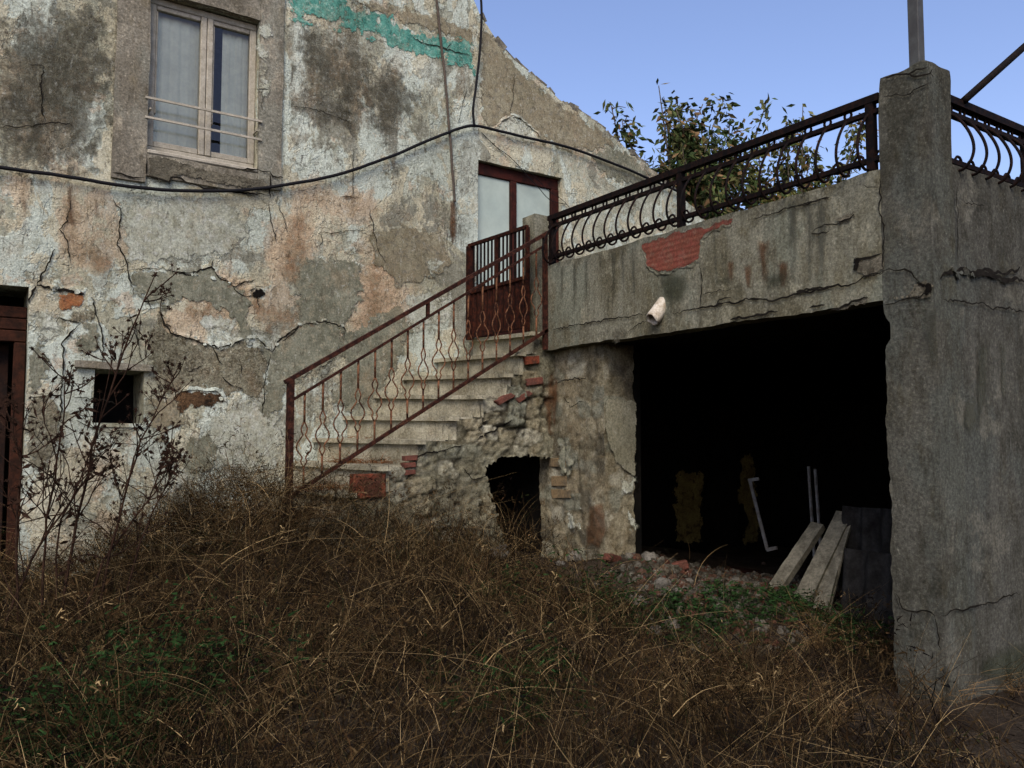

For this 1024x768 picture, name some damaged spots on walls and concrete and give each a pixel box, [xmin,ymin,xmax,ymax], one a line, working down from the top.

crack [1,64,71,128]
peeling [289,0,651,183]
crack [884,67,933,97]
crack [113,159,288,239]
crack [320,154,385,261]
flaking render [642,216,735,277]
crack [673,179,1024,320]
crack [28,201,132,433]
crack [114,201,345,414]
peeling [131,221,452,426]
peeling [147,395,218,473]
crack [895,592,1021,649]